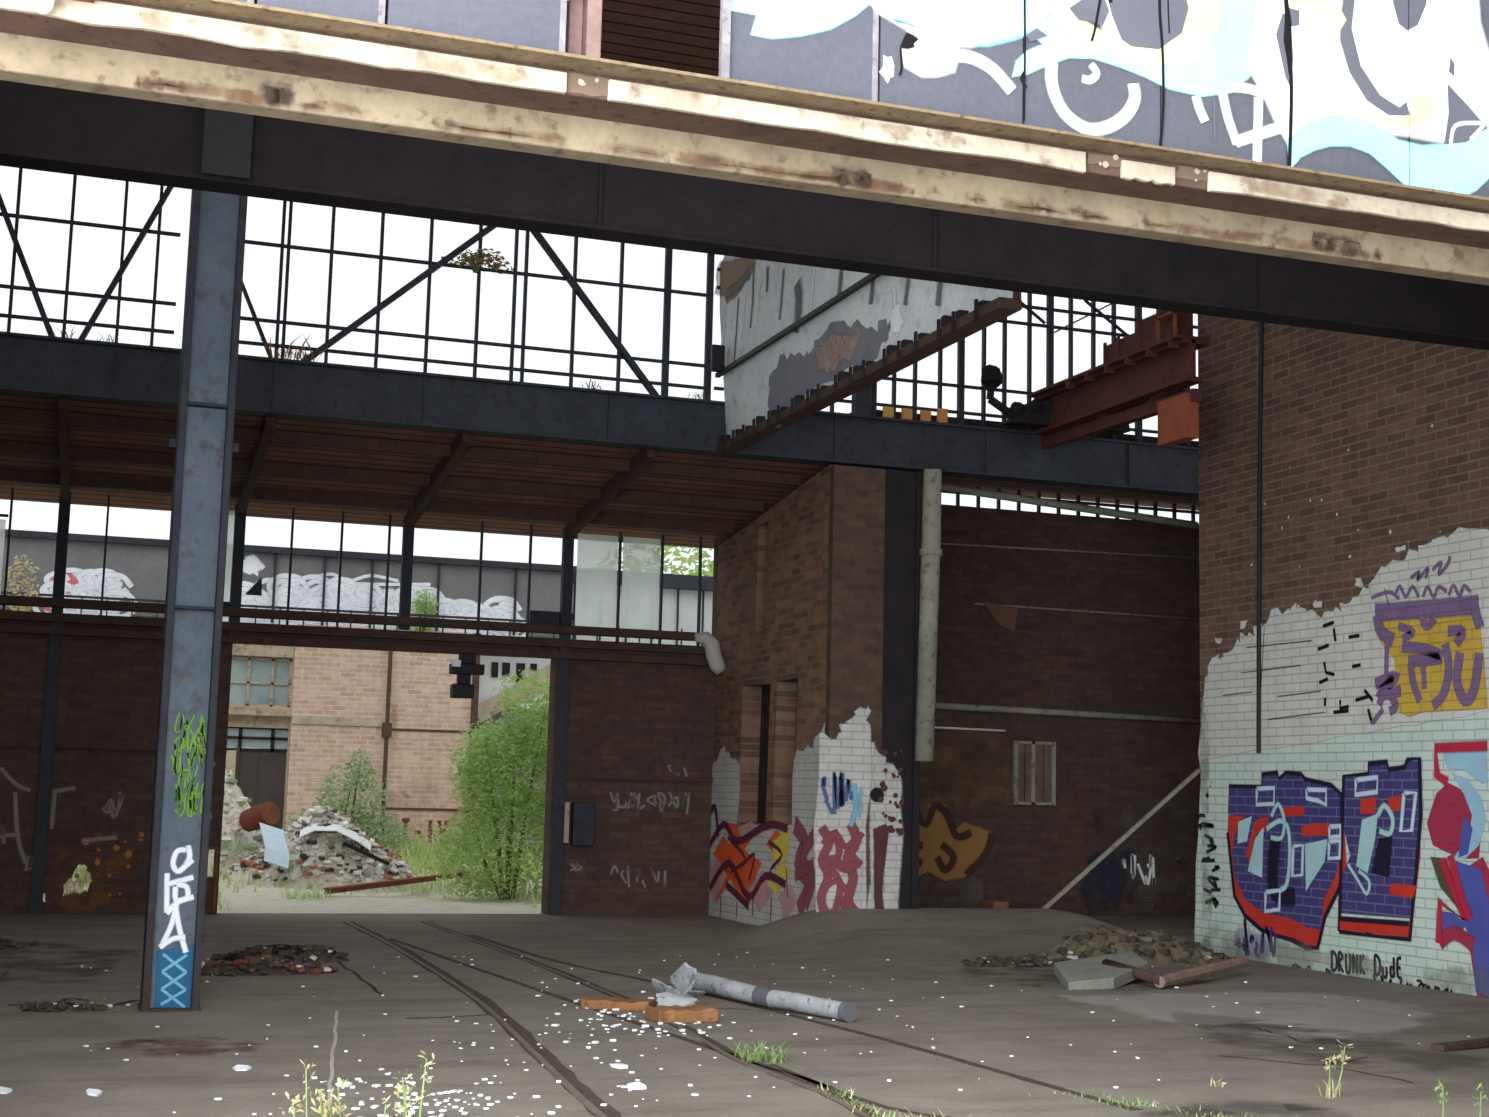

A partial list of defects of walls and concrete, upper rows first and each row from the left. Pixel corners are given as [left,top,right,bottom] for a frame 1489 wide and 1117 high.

peeling [768,304,905,428]
peeling [709,707,904,926]
peeling [1102,527,1489,996]